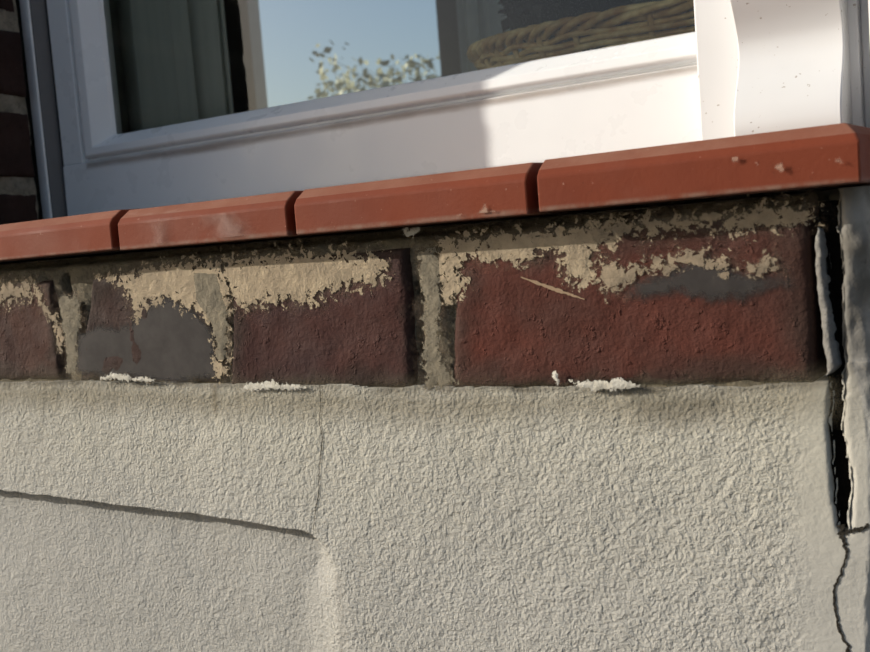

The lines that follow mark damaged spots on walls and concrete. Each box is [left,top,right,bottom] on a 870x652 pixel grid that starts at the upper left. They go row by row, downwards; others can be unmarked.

peeling [0,271,82,374]
water stain [76,296,218,382]
peeling [92,238,392,384]
peeling [240,379,306,392]
crack [313,384,323,530]
peeling [402,227,420,237]
peeling [416,192,842,392]
crack [818,200,869,652]